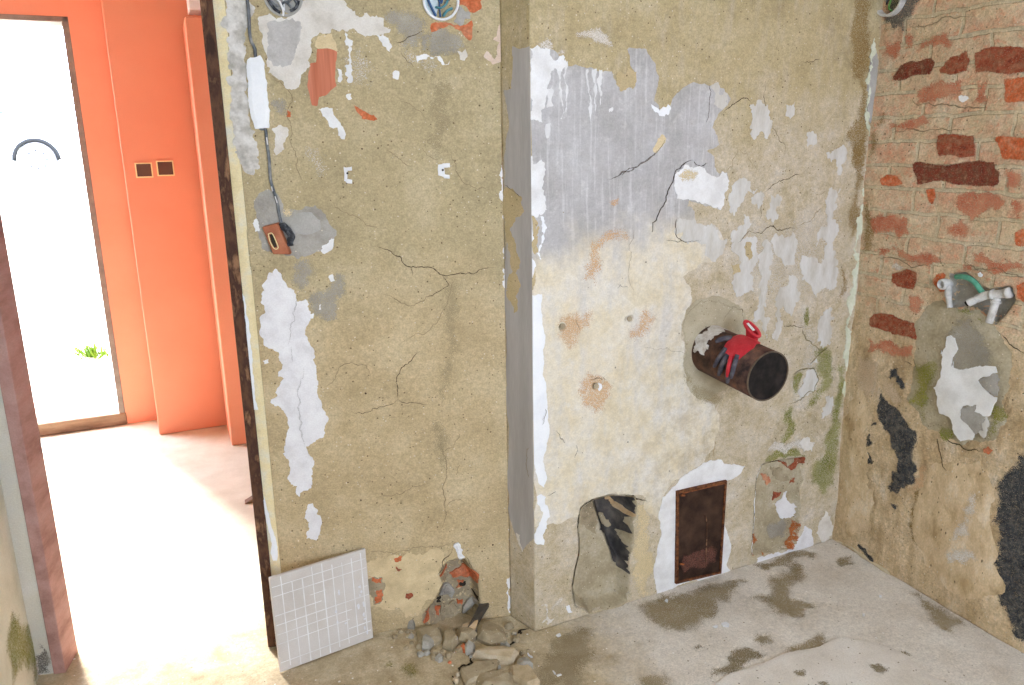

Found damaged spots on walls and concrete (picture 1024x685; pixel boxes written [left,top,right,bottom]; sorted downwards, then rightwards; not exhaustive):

peeling [220,0,391,175]
flaking render [893,45,1024,103]
crack [609,143,664,180]
flaking render [912,134,1024,204]
crack [618,152,825,288]
crack [334,205,486,414]
peeling [259,269,329,540]
flaking render [367,547,484,626]
damp [627,579,746,633]
damp [750,549,820,620]
damp [709,633,774,679]
damp [783,632,828,652]